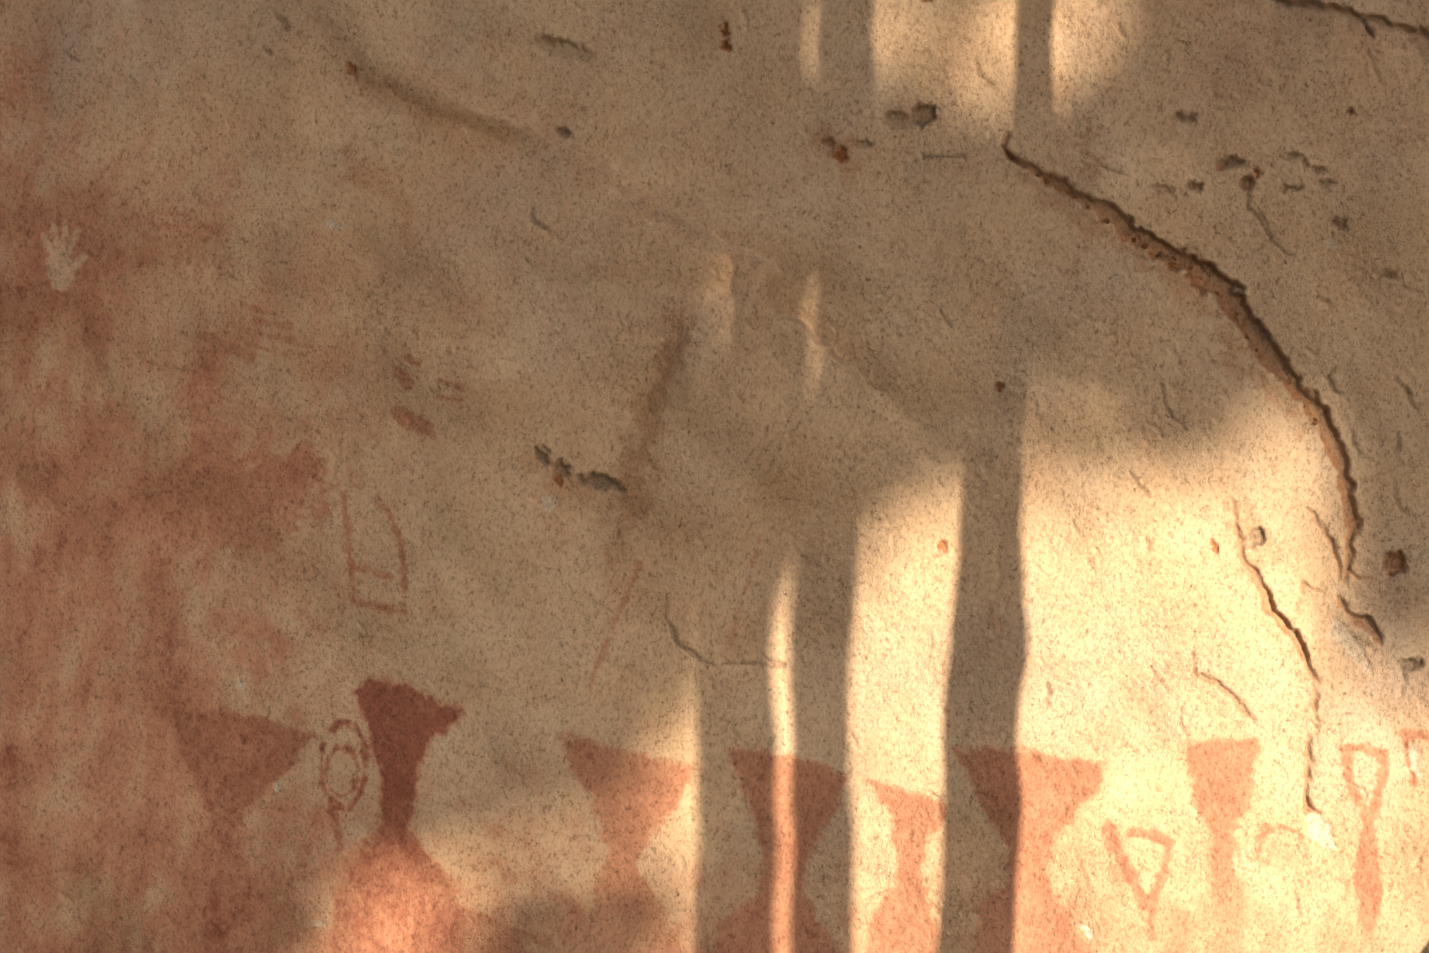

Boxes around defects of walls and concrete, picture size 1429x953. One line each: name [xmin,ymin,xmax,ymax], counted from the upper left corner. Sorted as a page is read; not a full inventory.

crack [1251,0,1429,49]
crack [973,58,997,91]
crack [920,130,1423,818]